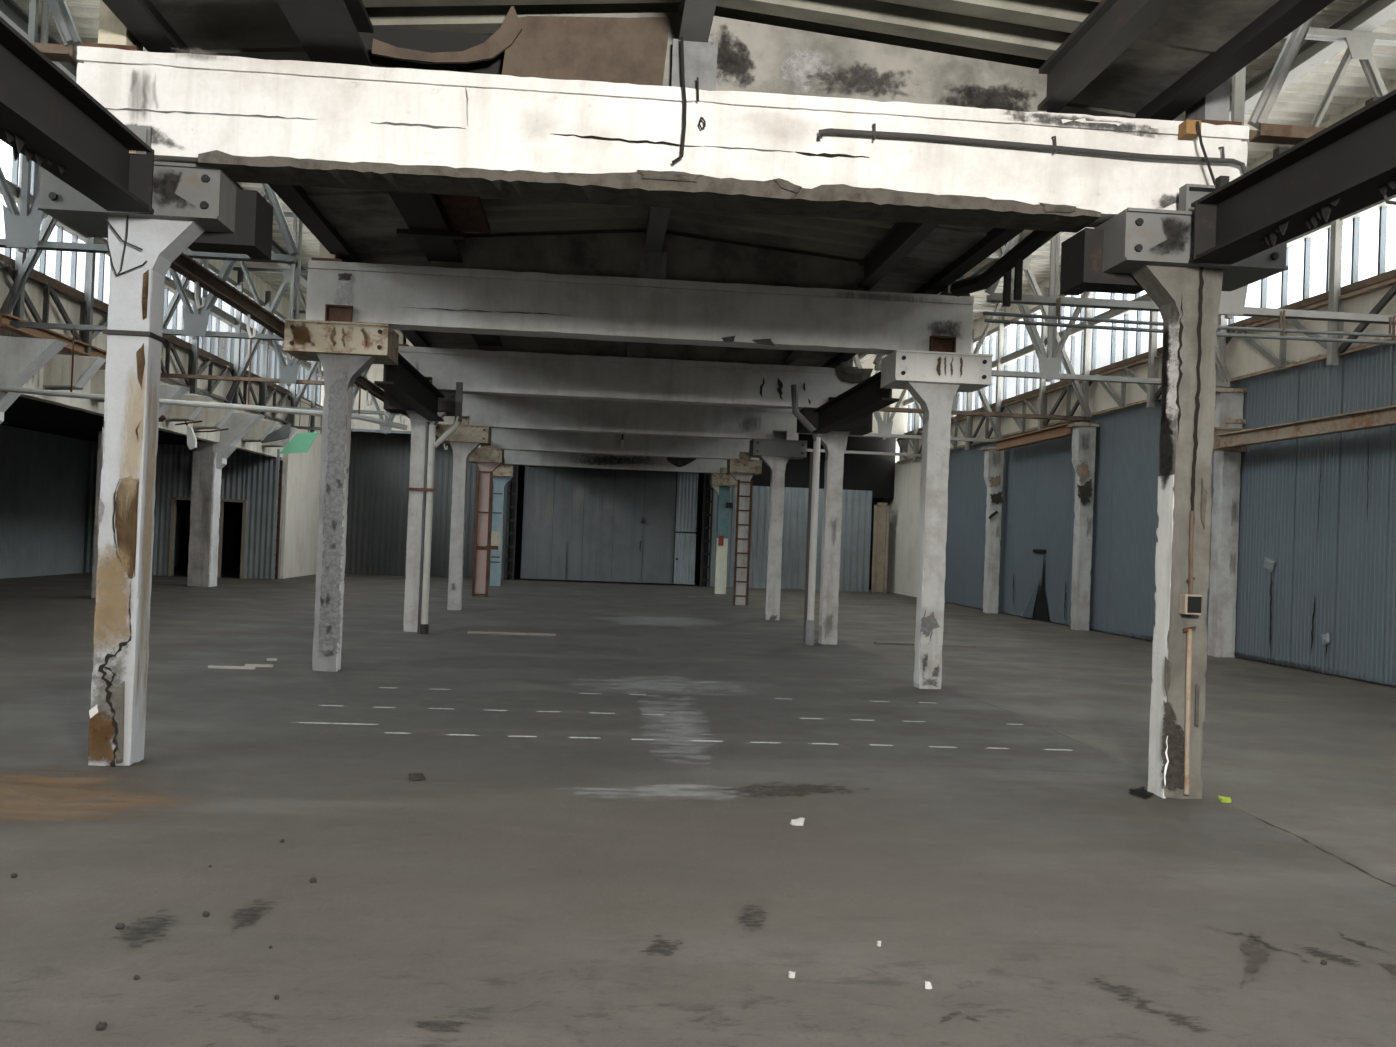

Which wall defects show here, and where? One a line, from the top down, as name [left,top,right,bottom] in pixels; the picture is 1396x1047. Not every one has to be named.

damp [783,50,828,91]
crack [106,108,307,119]
crack [371,86,468,129]
crack [550,133,870,158]
corrosion [291,323,368,347]
spalling [98,477,138,579]